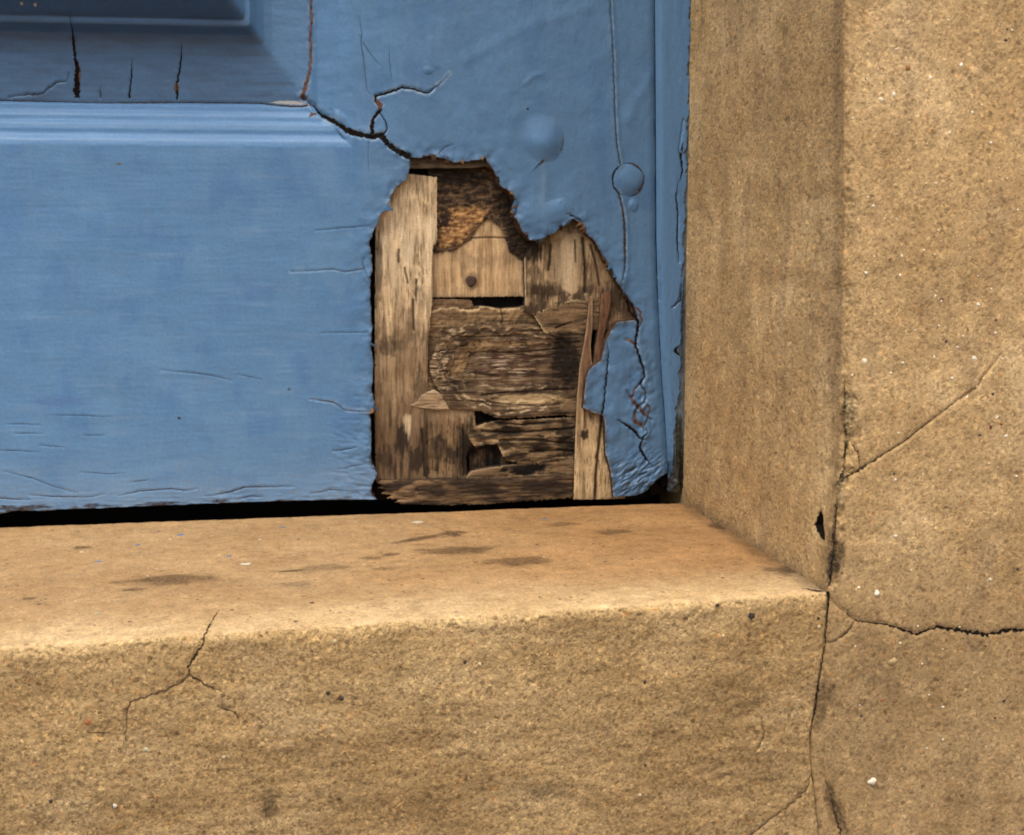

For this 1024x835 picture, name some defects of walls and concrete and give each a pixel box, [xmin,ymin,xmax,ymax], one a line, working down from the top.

crack [0,0,446,168]
crack [601,193,651,465]
crack [87,610,239,744]
crack [750,358,1024,835]